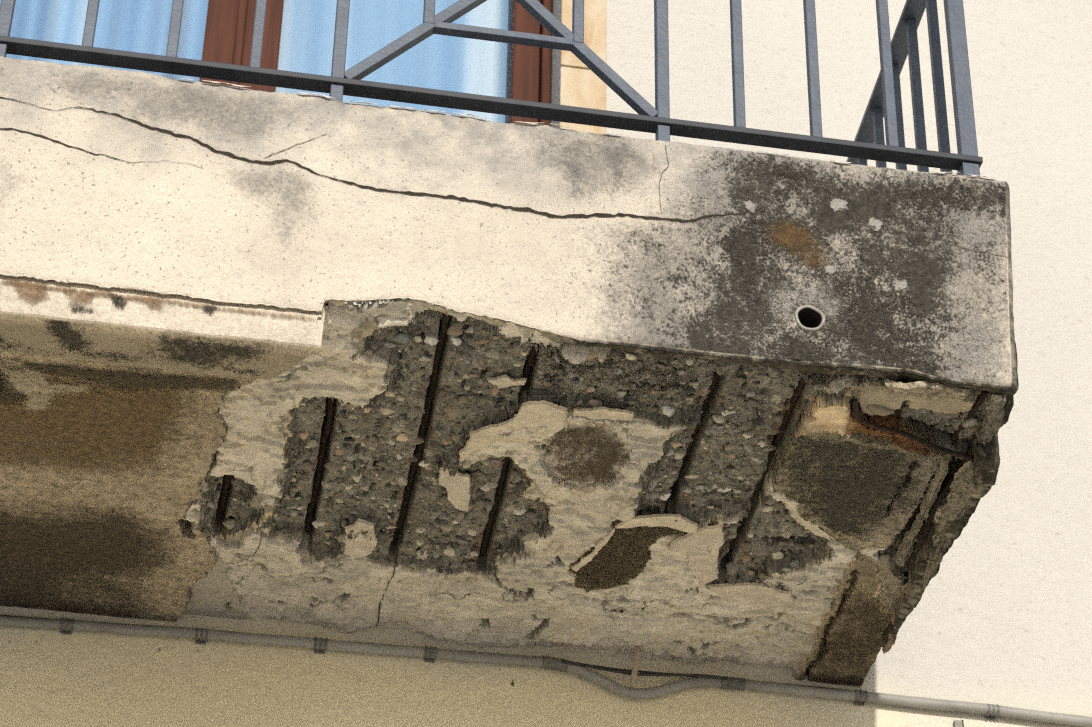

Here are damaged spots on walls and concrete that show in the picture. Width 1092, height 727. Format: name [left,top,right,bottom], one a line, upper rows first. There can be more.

crack [0,97,757,222]
damp [601,150,1007,391]
damp [0,279,310,474]
damp [538,421,631,487]
flaking render [182,299,1006,678]
damp [541,344,698,403]
mould [780,432,923,539]
rust [846,398,935,455]
damp [0,506,171,618]
damp [572,522,679,590]